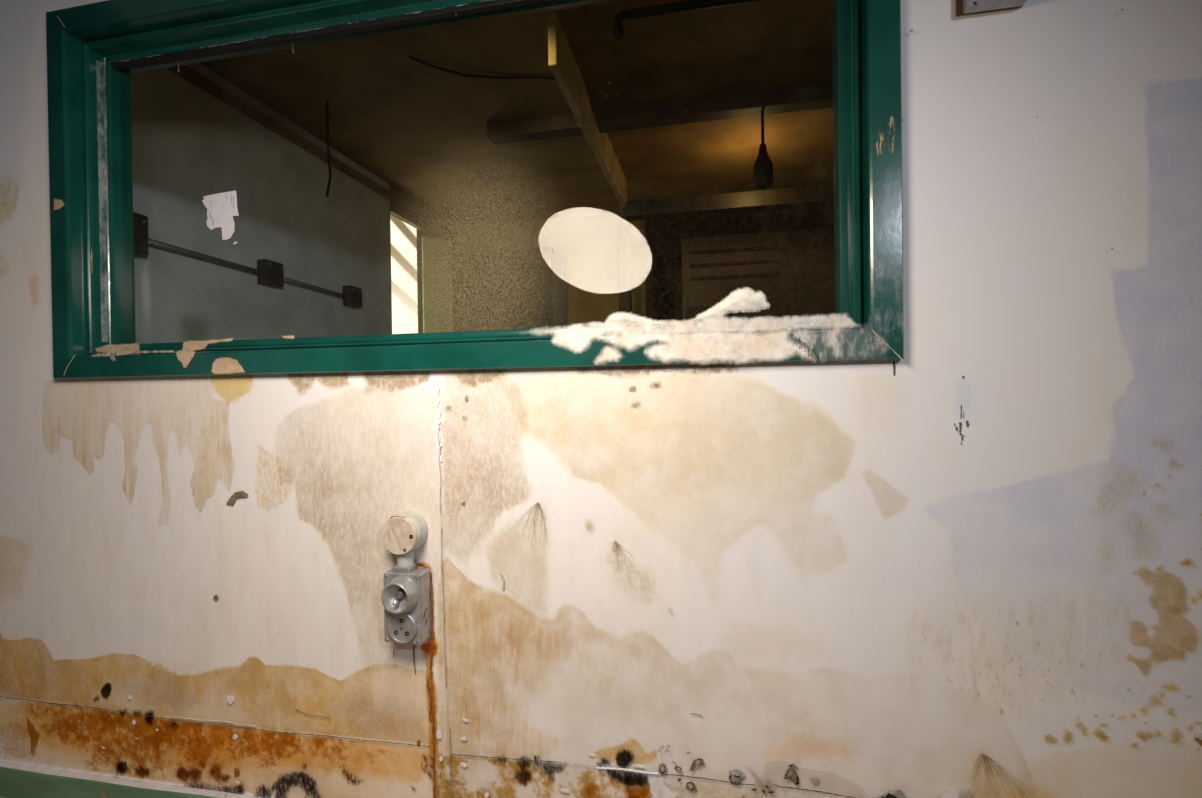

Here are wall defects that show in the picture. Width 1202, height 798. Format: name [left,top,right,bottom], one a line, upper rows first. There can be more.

peeling [91,338,233,368]
peeling [212,357,245,374]
peeling [552,328,814,363]
damp [94,683,111,701]
corrosion [413,563,436,798]
damp [120,710,153,725]
damp [117,761,149,777]
damp [177,763,322,798]
damp [497,756,564,786]
damp [597,749,648,798]